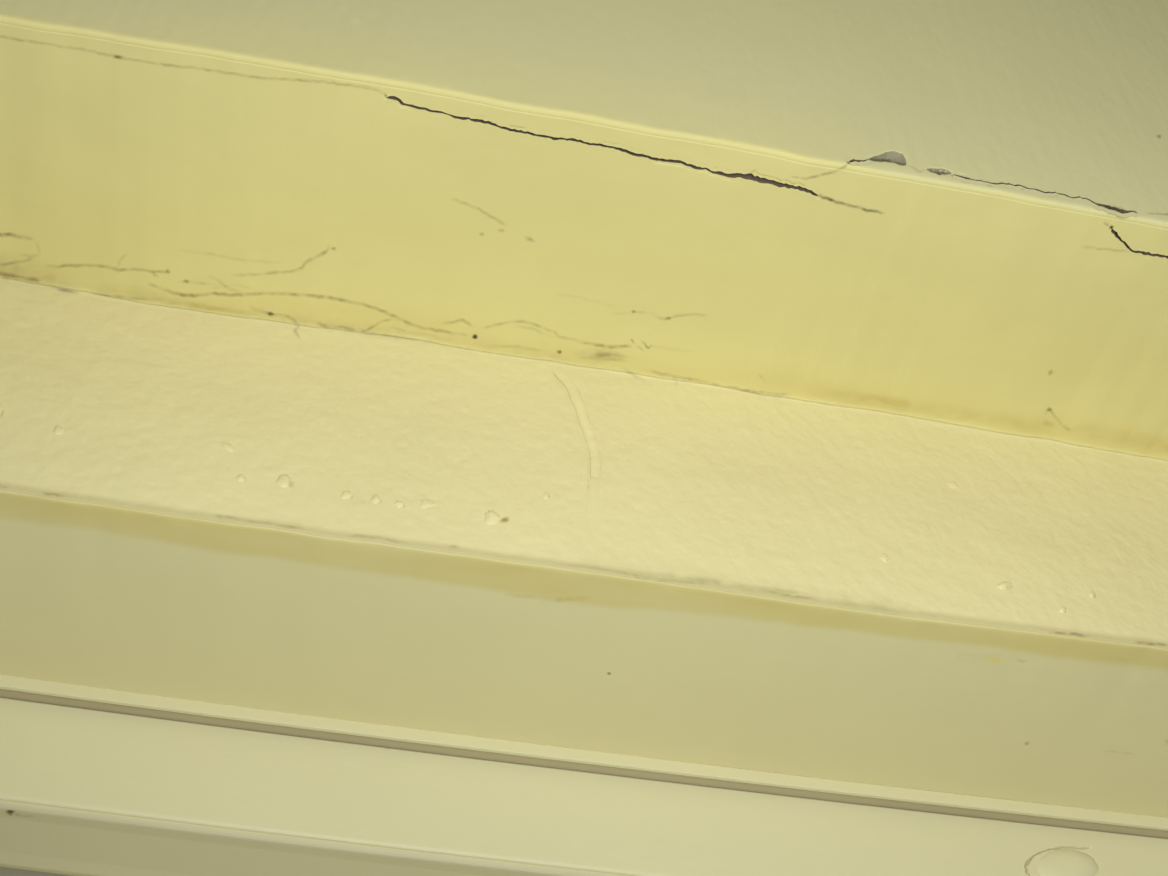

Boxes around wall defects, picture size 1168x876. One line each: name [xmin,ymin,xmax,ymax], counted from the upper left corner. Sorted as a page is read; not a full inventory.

crack [387,92,832,201]
flaking render [867,151,906,165]
crack [953,171,1168,262]